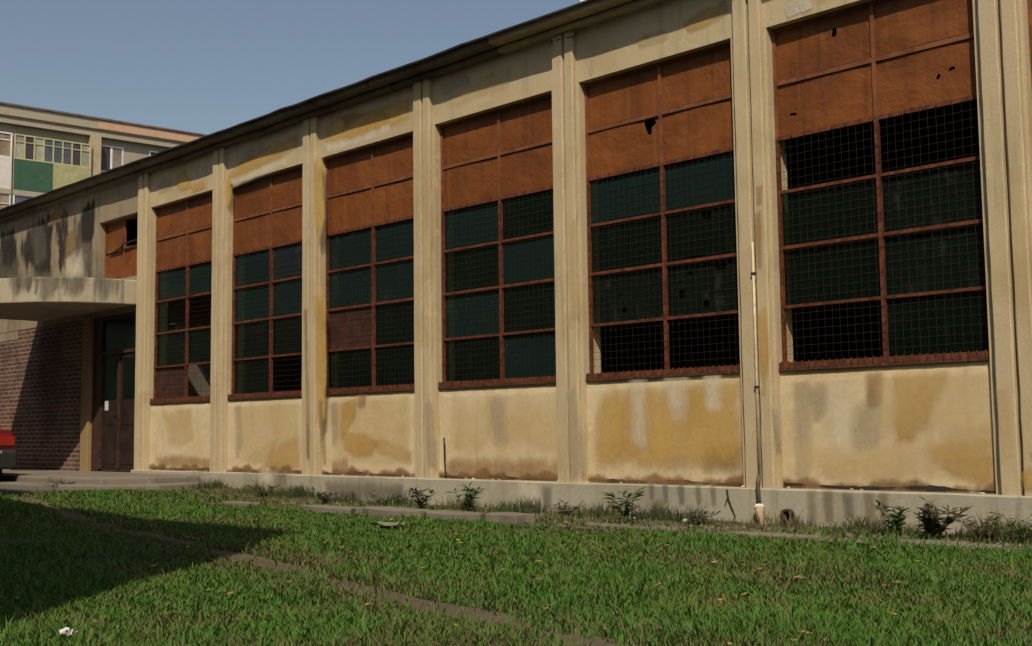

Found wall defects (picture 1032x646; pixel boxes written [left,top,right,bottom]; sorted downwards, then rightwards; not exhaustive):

mould [0,201,110,298]
damp [896,374,943,439]